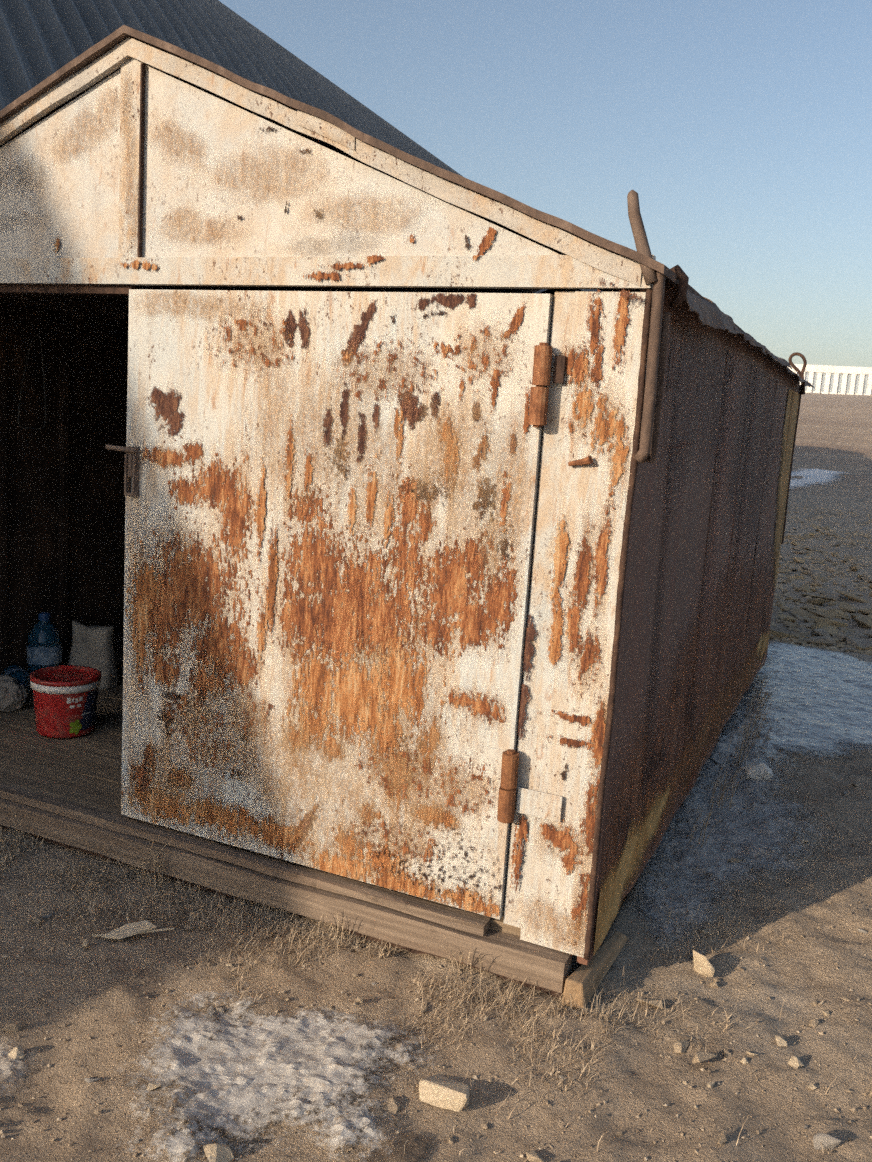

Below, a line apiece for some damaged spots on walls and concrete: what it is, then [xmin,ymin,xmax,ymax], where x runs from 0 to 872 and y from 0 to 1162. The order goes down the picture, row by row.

corrosion [473,227,497,262]
corrosion [120,260,157,271]
corrosion [303,254,384,282]
corrosion [121,278,644,945]